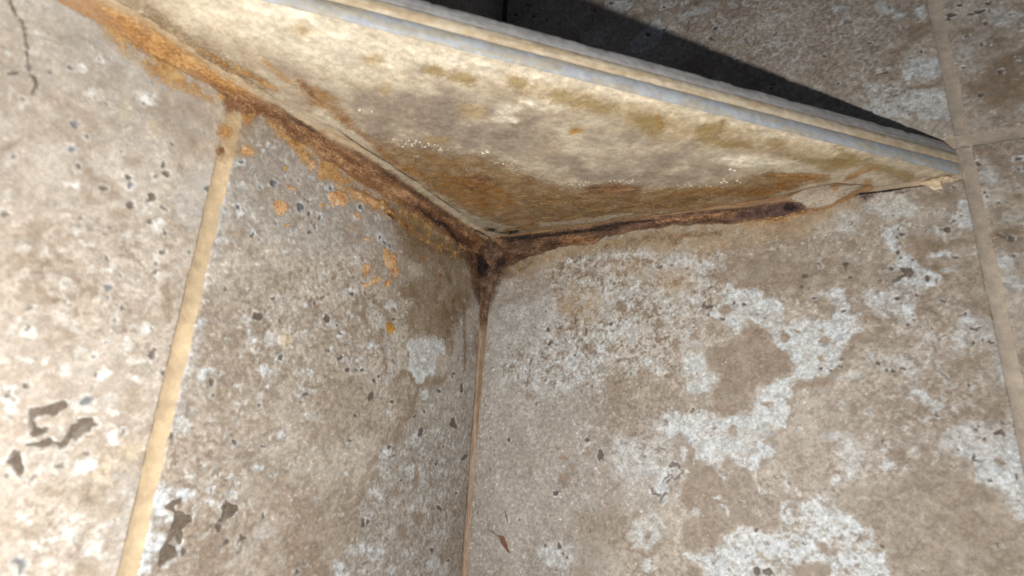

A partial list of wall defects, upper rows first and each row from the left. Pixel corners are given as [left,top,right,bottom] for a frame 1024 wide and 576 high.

crack [7,0,37,93]
water stain [422,67,475,83]
water stain [694,121,750,148]
corrosion [99,6,877,328]
water stain [768,139,917,183]
mould [734,201,805,221]
water stain [485,219,655,240]
water stain [477,249,506,277]